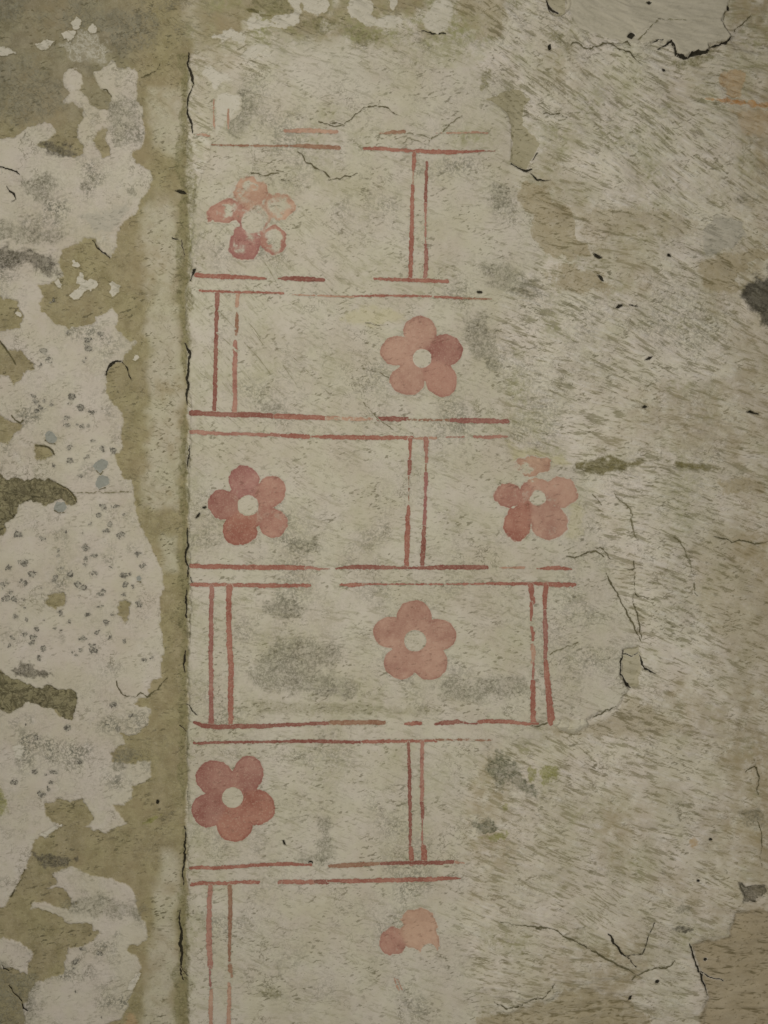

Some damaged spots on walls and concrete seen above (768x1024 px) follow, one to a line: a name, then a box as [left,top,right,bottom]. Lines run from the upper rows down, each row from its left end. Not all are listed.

crack [570,10,752,65]
crack [186,52,195,134]
crack [171,237,192,281]
crack [184,342,192,405]
peeling [0,0,197,1024]
crack [184,528,193,619]
crack [566,492,656,719]
crack [672,536,699,597]
crack [714,536,768,545]
crack [178,825,189,981]
crack [500,922,724,995]
crack [493,982,556,1011]